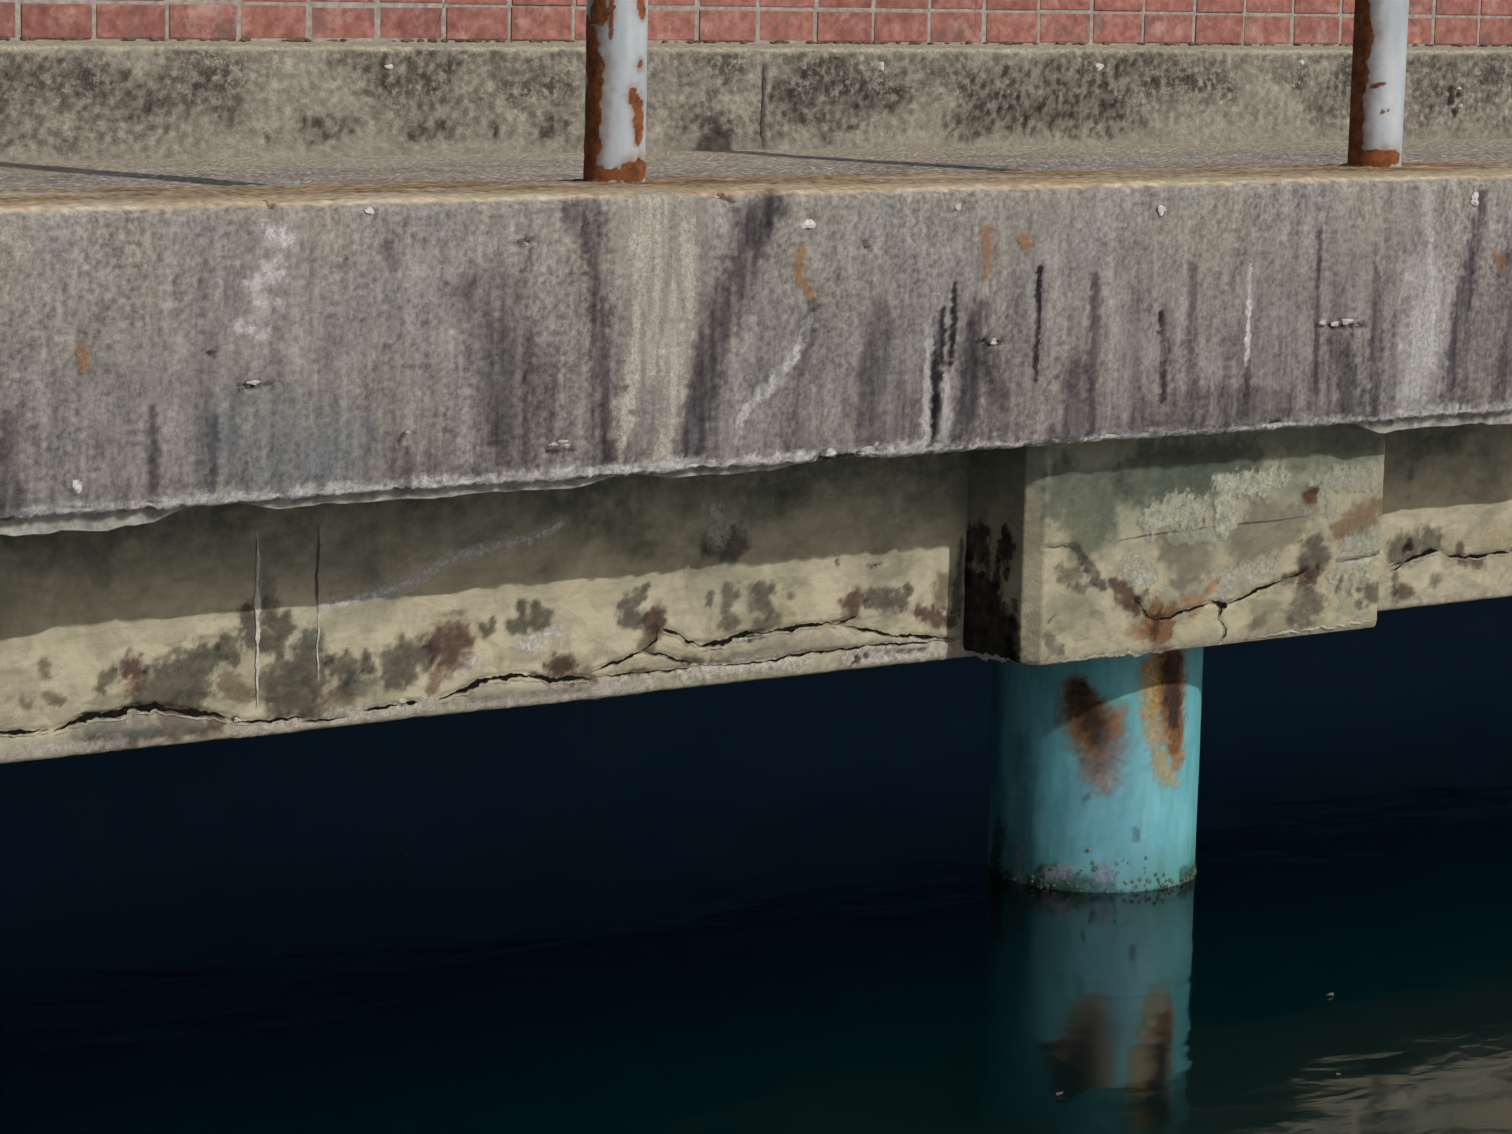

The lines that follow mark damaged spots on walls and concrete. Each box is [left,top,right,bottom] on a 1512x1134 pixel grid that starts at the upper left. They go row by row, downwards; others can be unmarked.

corrosion [583,0,651,185]
corrosion [1347,0,1467,169]
damp [8,192,833,518]
damp [852,237,1512,458]
damp [841,525,1015,667]
crack [1044,545,1089,566]
crack [1133,548,1512,641]
damp [234,653,457,738]
crack [0,611,957,737]
damp [467,674,657,710]
corrosion [1063,678,1126,799]
corrosion [1141,578,1221,782]